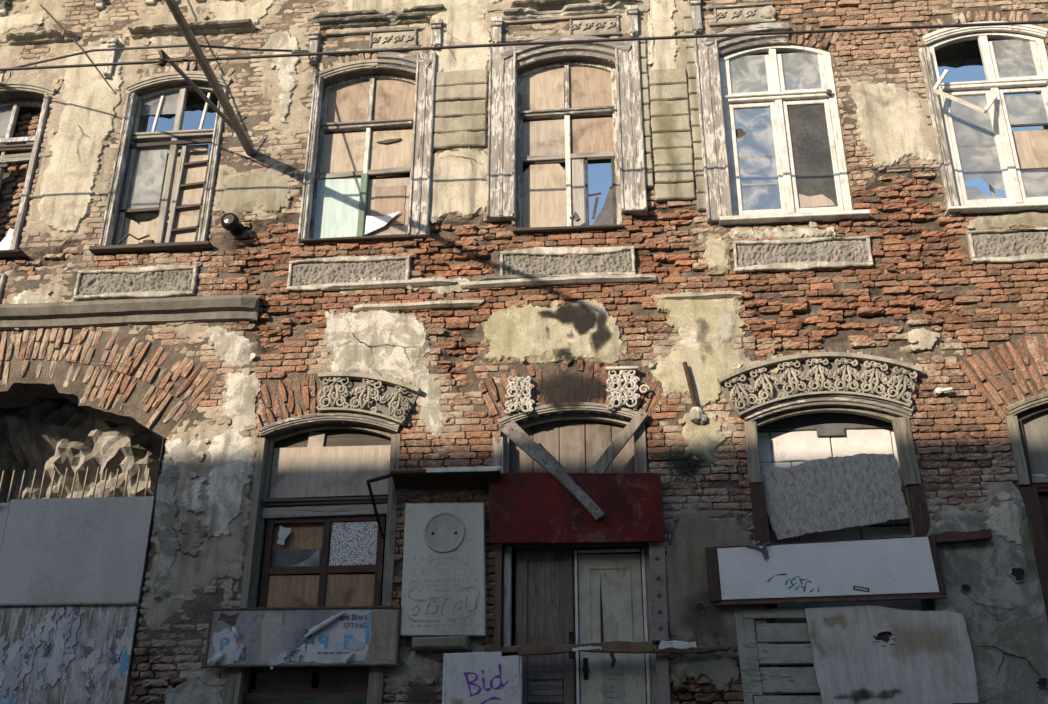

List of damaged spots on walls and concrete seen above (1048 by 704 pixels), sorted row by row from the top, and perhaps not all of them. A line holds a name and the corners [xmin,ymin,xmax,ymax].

peeling [346,0,503,77]
peeling [641,0,680,70]
spalling [618,204,839,279]
spalling [845,77,1048,274]
peeling [143,170,627,623]
spalling [648,287,972,465]
peeling [926,482,1048,704]
crack [973,645,1048,690]